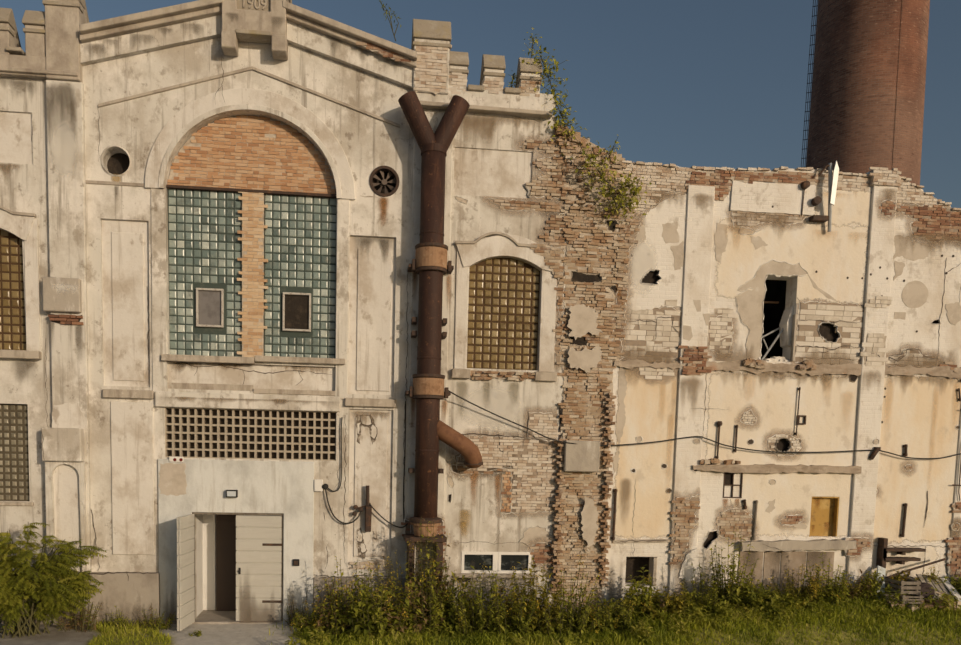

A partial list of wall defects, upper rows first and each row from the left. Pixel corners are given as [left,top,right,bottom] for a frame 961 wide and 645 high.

flaking render [484,136,961,473]
crack [797,258,961,362]
flaking render [470,371,535,381]
flaking render [665,487,757,567]
flaking render [765,499,807,529]
flaking render [951,501,961,513]
flaking render [944,535,961,582]